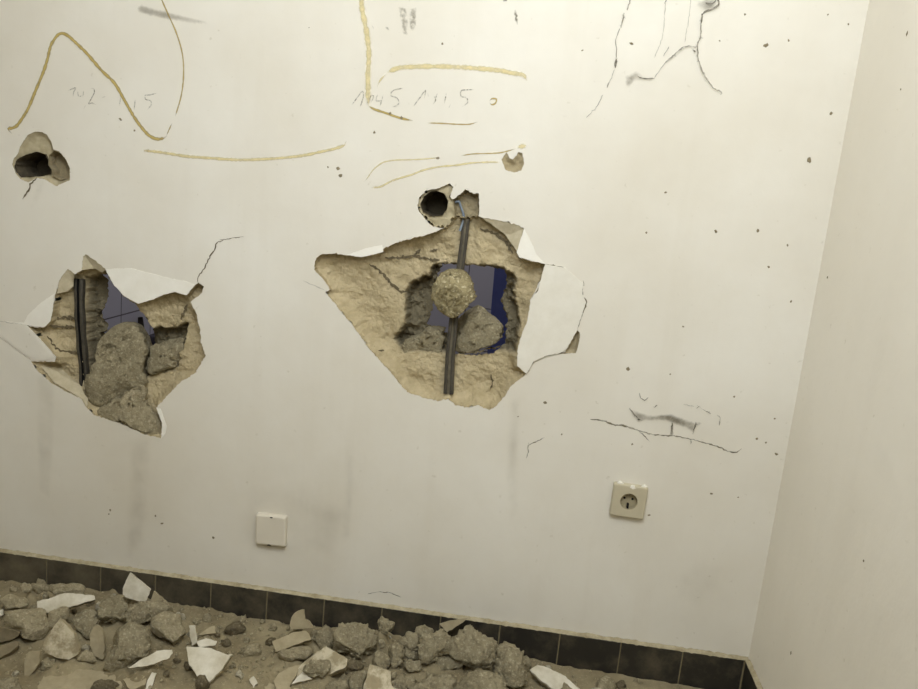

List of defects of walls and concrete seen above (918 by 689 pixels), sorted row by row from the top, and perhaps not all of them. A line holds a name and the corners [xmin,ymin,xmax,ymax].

spalling [12,132,70,186]
crack [197,237,240,282]
flaking render [314,184,586,410]
flaking render [4,254,206,438]
crack [590,419,742,453]